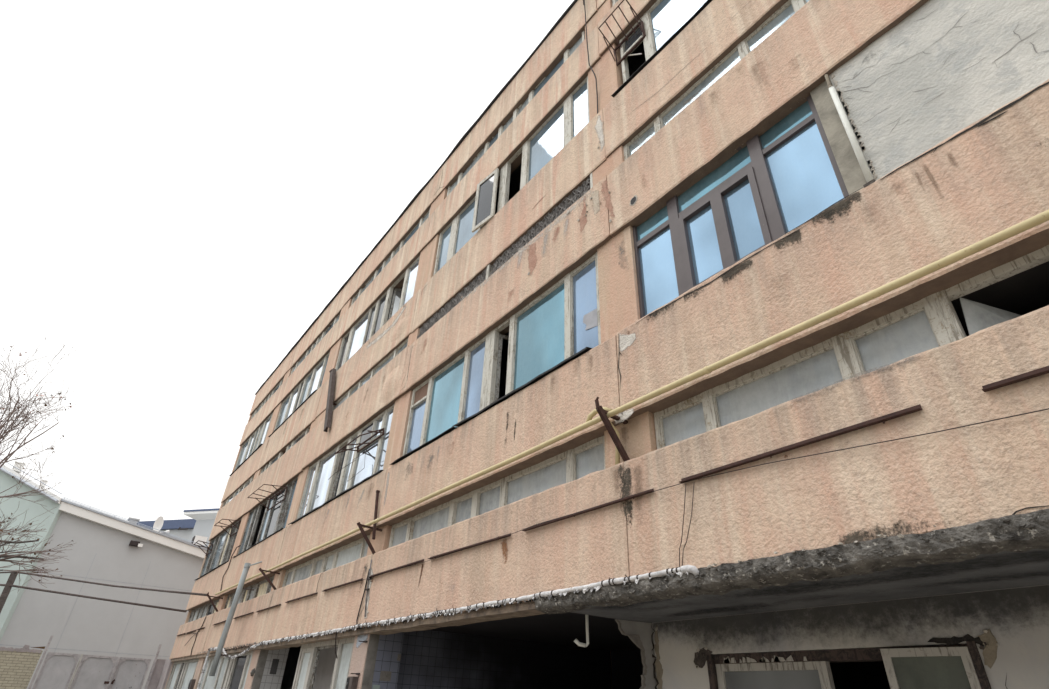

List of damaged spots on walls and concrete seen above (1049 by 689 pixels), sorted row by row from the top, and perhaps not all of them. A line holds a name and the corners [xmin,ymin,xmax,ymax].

spalling [534,509,1049,615]